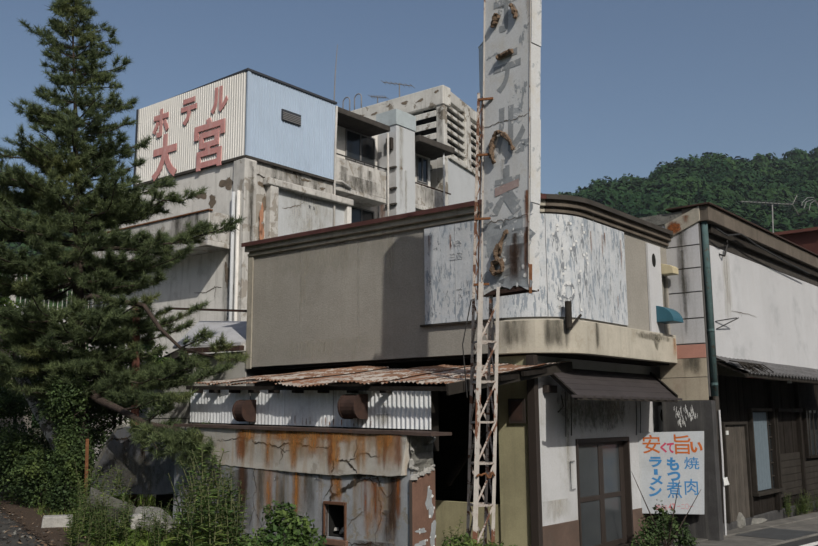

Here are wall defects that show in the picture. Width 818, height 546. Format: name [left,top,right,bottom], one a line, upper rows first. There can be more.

spalling [196,191,216,208]
spalling [219,177,233,190]
peeling [552,216,623,317]
rust [239,467,247,509]
crack [303,474,394,546]
rust [360,476,400,546]
peeling [414,486,436,546]